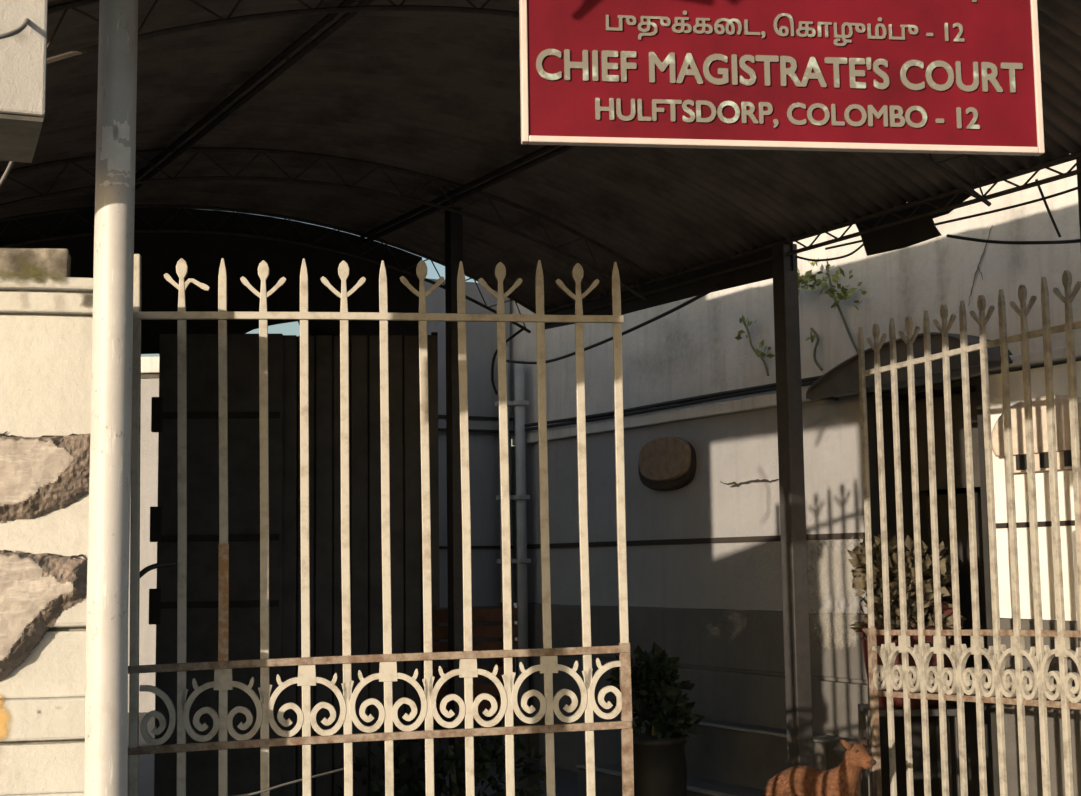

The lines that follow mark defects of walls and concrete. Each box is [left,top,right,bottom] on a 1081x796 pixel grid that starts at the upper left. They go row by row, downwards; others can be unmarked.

crack [720,479,779,487]